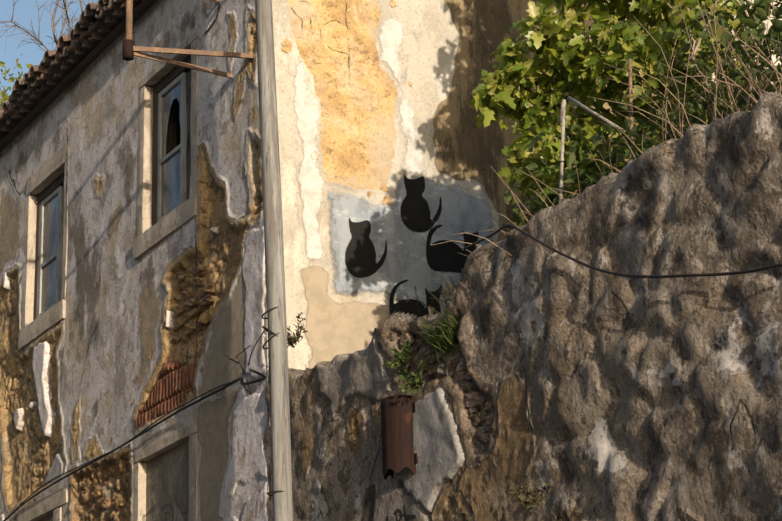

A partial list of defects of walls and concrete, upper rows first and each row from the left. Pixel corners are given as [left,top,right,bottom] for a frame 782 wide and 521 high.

spalling [281,0,426,260]
water stain [433,0,566,242]
spalling [0,3,271,521]
spalling [345,268,537,521]